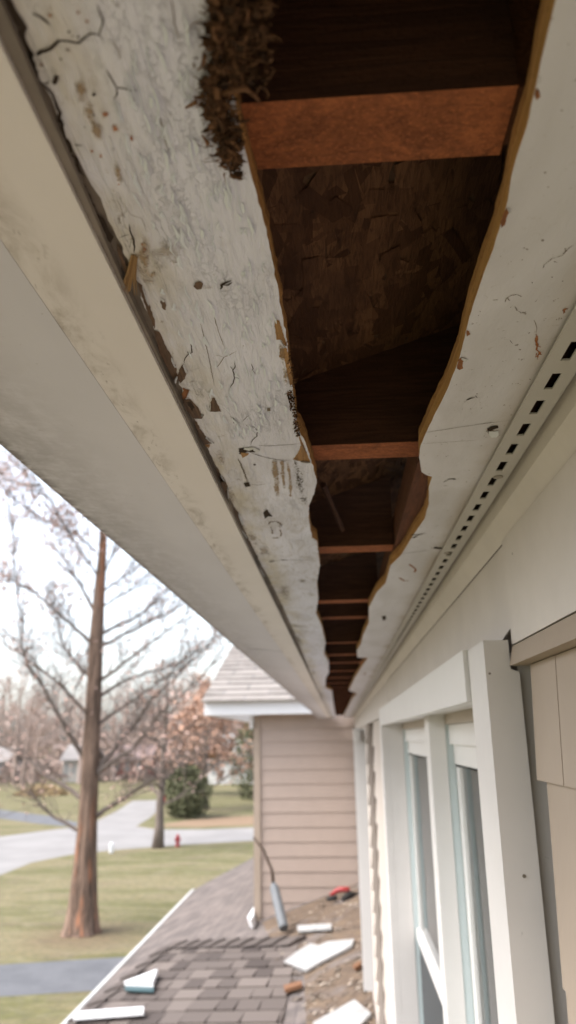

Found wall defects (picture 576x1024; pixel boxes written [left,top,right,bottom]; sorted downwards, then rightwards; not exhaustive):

crack [4,0,136,178]
peeling [138,283,221,449]
peeling [274,320,293,386]
peeling [239,447,260,465]
peeling [293,436,310,463]